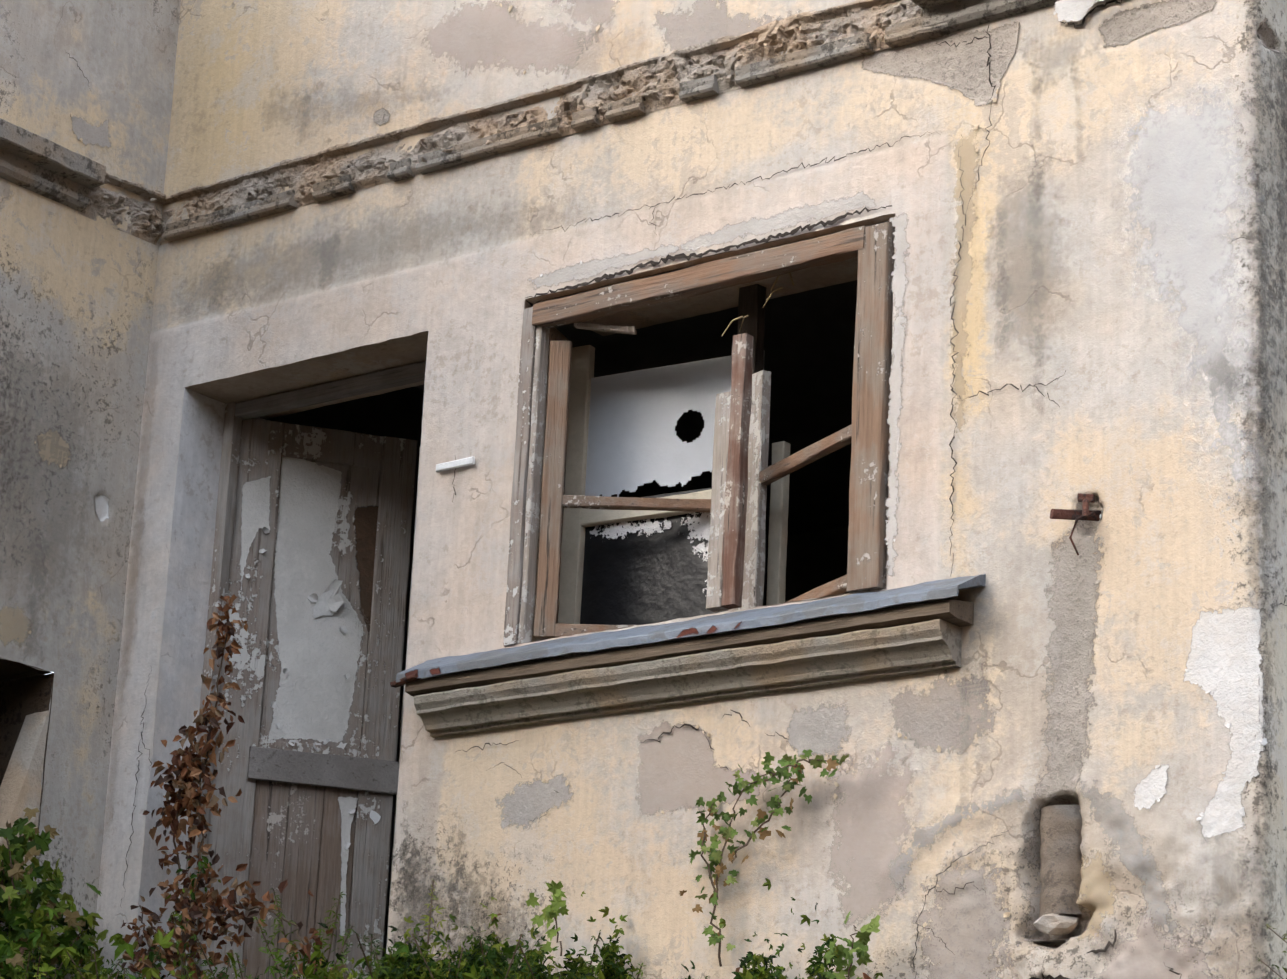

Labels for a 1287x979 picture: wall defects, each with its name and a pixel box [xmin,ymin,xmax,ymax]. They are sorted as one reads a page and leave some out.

peeling [1053,0,1104,22]
spalling [1099,0,1217,47]
spalling [373,108,390,126]
crack [526,25,1066,573]
spalling [95,495,109,522]
peeling [239,457,378,751]
peeling [787,674,995,927]
spalling [1033,496,1104,821]
peeling [1134,764,1169,811]
peeling [1183,606,1267,841]
peeling [912,837,1220,979]